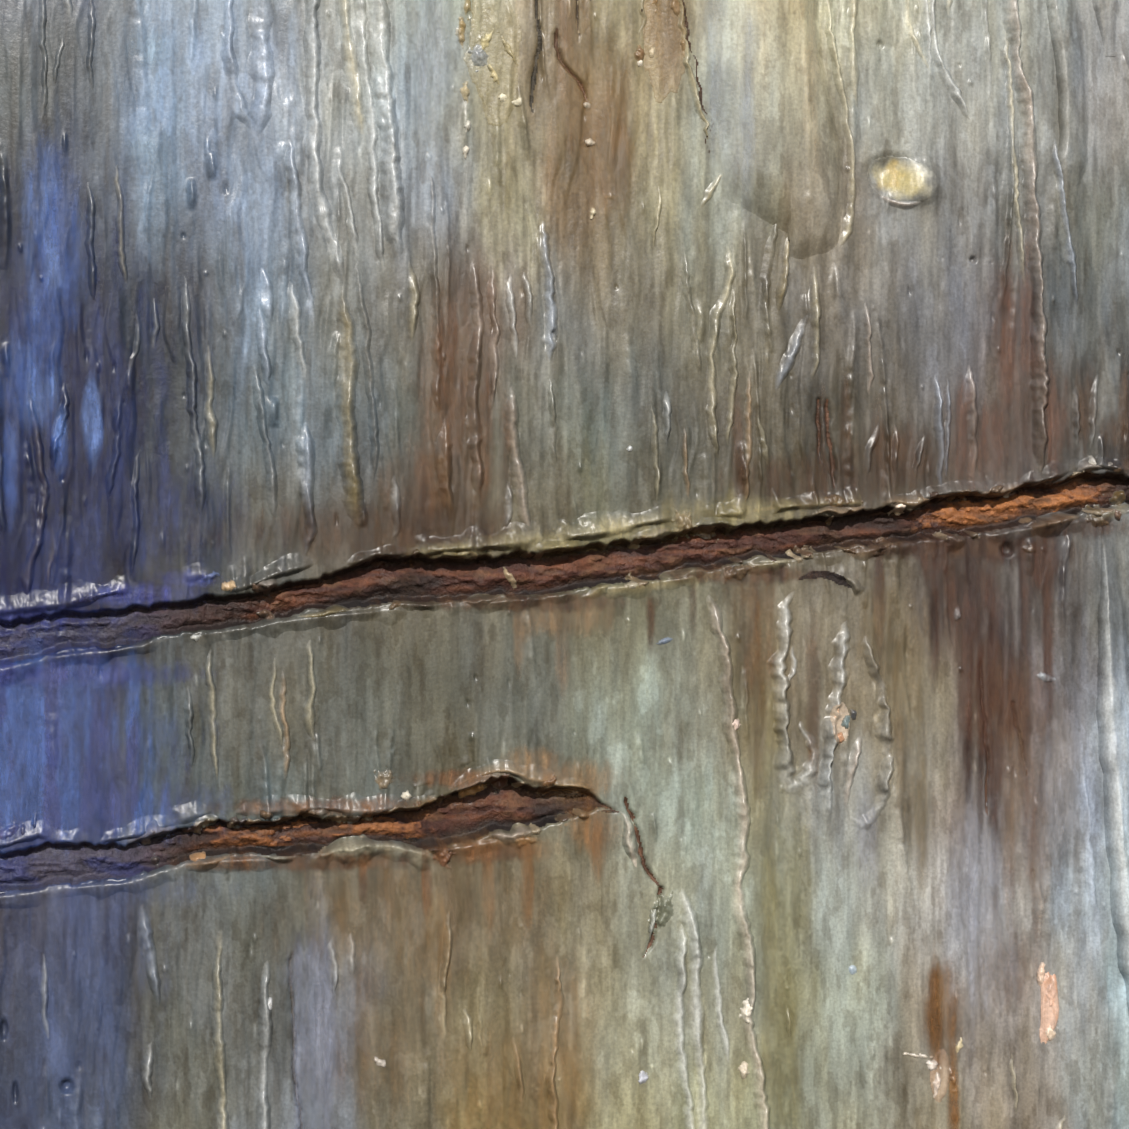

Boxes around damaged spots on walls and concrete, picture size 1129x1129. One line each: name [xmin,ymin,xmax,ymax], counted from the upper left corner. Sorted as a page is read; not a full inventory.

crack [0,399,1129,688]
crack [0,755,677,958]
corrosion [927,971,956,1053]
spalling [1036,962,1059,1044]
corrosion [949,1061,959,1129]